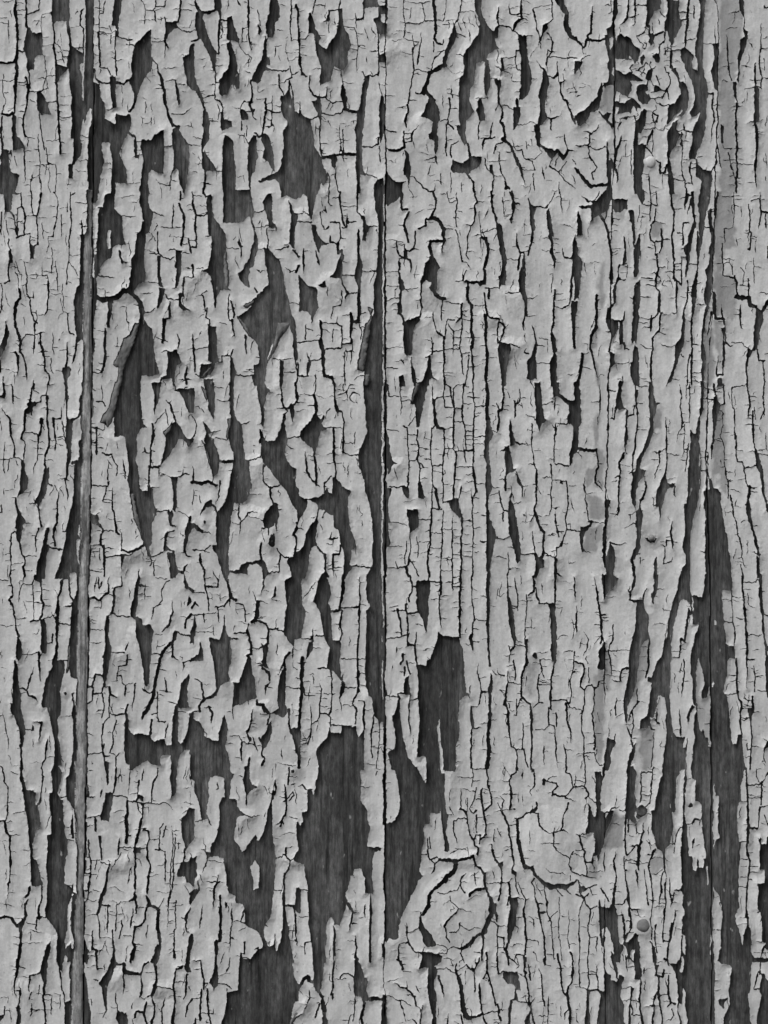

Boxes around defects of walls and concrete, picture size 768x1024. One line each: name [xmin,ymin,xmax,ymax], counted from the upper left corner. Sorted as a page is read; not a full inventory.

peeling [0,63,16,81]
peeling [0,0,17,63]
peeling [403,0,434,24]
peeling [322,323,342,349]
crack [132,0,768,830]
peeling [444,319,472,421]
crack [0,0,391,1024]
peeling [431,422,475,586]
peeling [569,662,584,710]
crack [415,554,700,1024]
crack [741,841,757,924]
crack [302,891,424,1024]